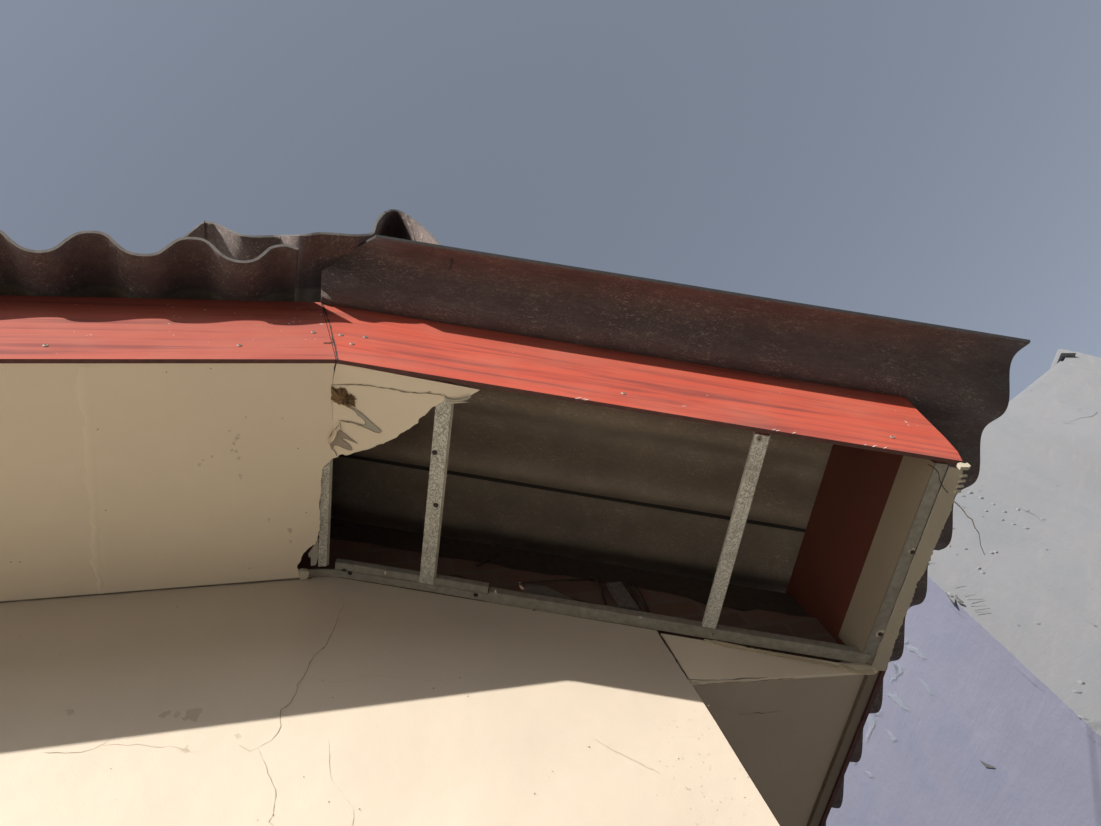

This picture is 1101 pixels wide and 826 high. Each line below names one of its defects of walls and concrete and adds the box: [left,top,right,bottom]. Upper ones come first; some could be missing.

spalling [299,538,319,580]
crack [243,599,439,821]